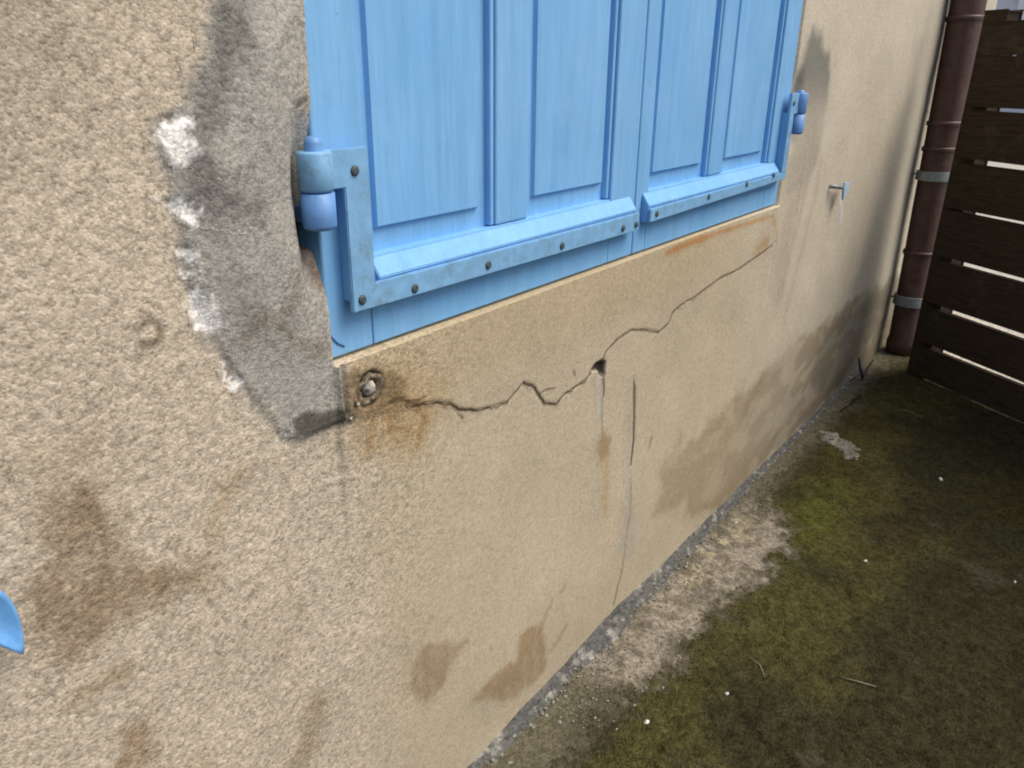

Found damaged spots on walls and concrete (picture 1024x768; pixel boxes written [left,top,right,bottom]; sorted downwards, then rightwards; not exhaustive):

corrosion [320,340,463,492]
crack [388,242,775,418]
spalling [589,356,607,378]
crack [613,378,636,606]
corrosion [663,208,780,267]
damp [591,0,950,570]
damp [402,633,472,714]
damp [469,571,572,710]